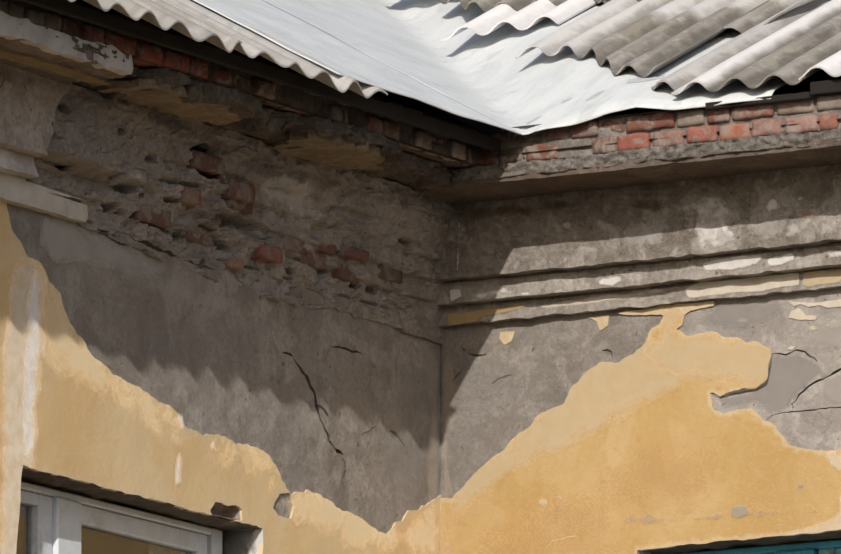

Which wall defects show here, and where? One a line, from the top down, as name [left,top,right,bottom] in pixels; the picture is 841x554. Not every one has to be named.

peeling [703,253,794,270]
peeling [599,277,621,285]
peeling [686,273,799,298]
peeling [803,269,841,287]
flaking render [1,84,454,554]
crack [331,346,362,354]
crack [713,349,841,420]
crack [283,352,343,455]
flaking render [440,288,841,507]
crack [363,426,405,446]
peeling [790,498,841,535]